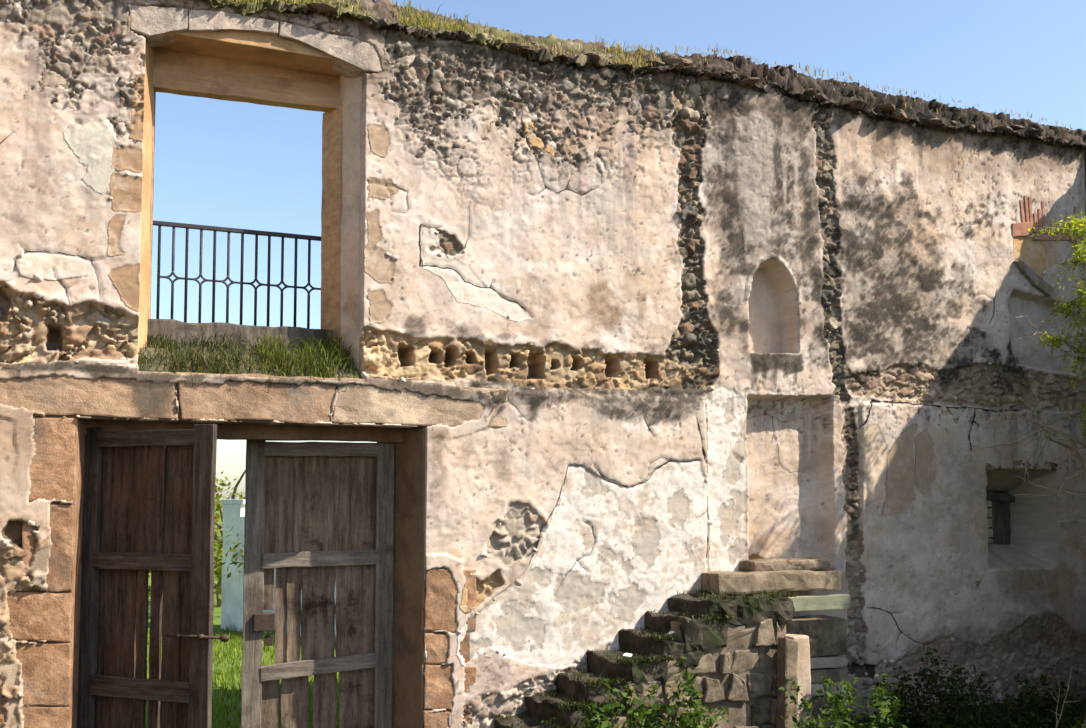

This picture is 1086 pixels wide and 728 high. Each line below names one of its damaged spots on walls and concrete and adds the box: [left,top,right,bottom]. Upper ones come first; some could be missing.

spalling [0,520,53,728]
spalling [0,0,145,365]
crack [368,182,533,318]
peeling [361,27,763,728]
crack [529,419,709,565]
water stain [699,84,1035,394]
spalling [811,101,1086,720]